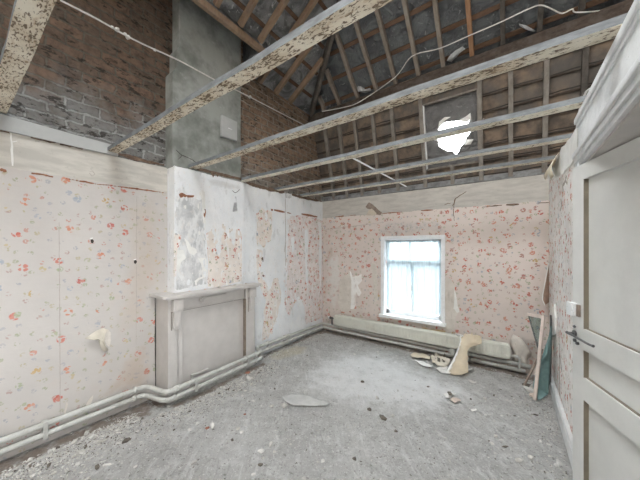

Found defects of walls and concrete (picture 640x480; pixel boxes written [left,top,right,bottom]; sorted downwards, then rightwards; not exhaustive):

peeling [350,272,362,309]
peeling [85,328,111,352]